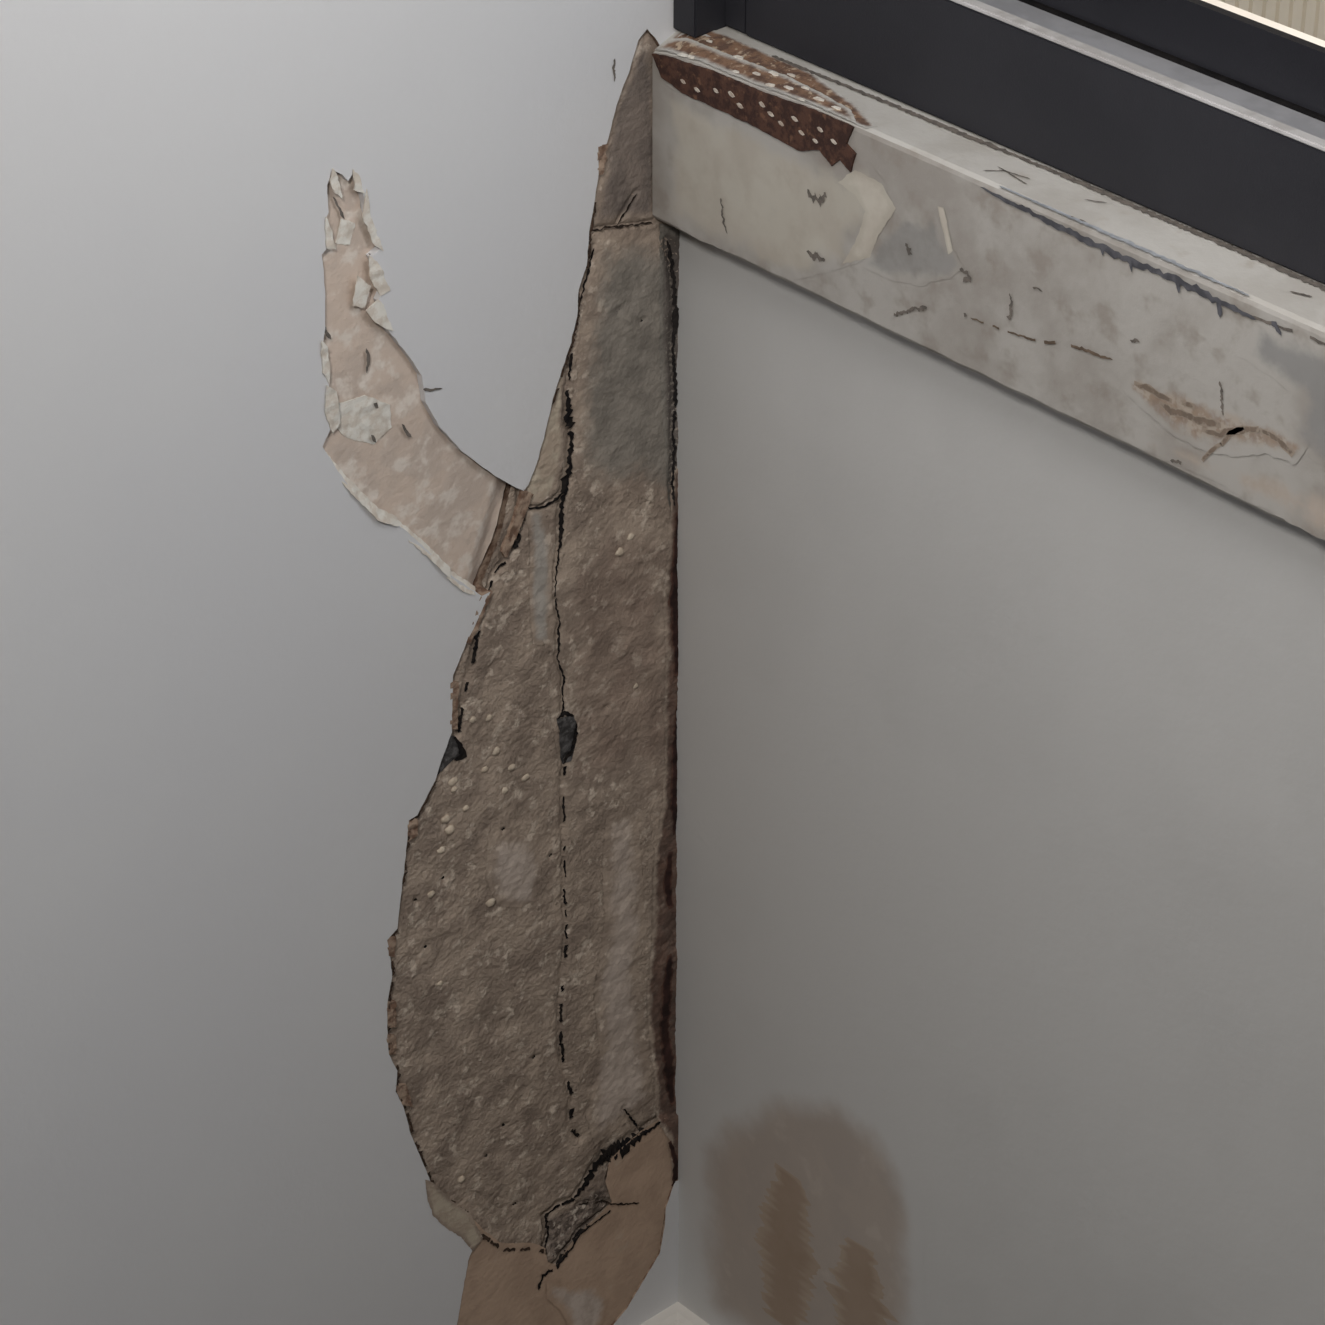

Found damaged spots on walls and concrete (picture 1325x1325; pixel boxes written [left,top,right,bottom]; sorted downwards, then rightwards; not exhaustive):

rust [655,30,877,128]
peeling [894,305,927,317]
crack [488,194,679,713]
crack [457,630,481,732]
flaking render [321,31,896,1325]
crack [538,766,661,1290]
water stain [689,1075,927,1325]